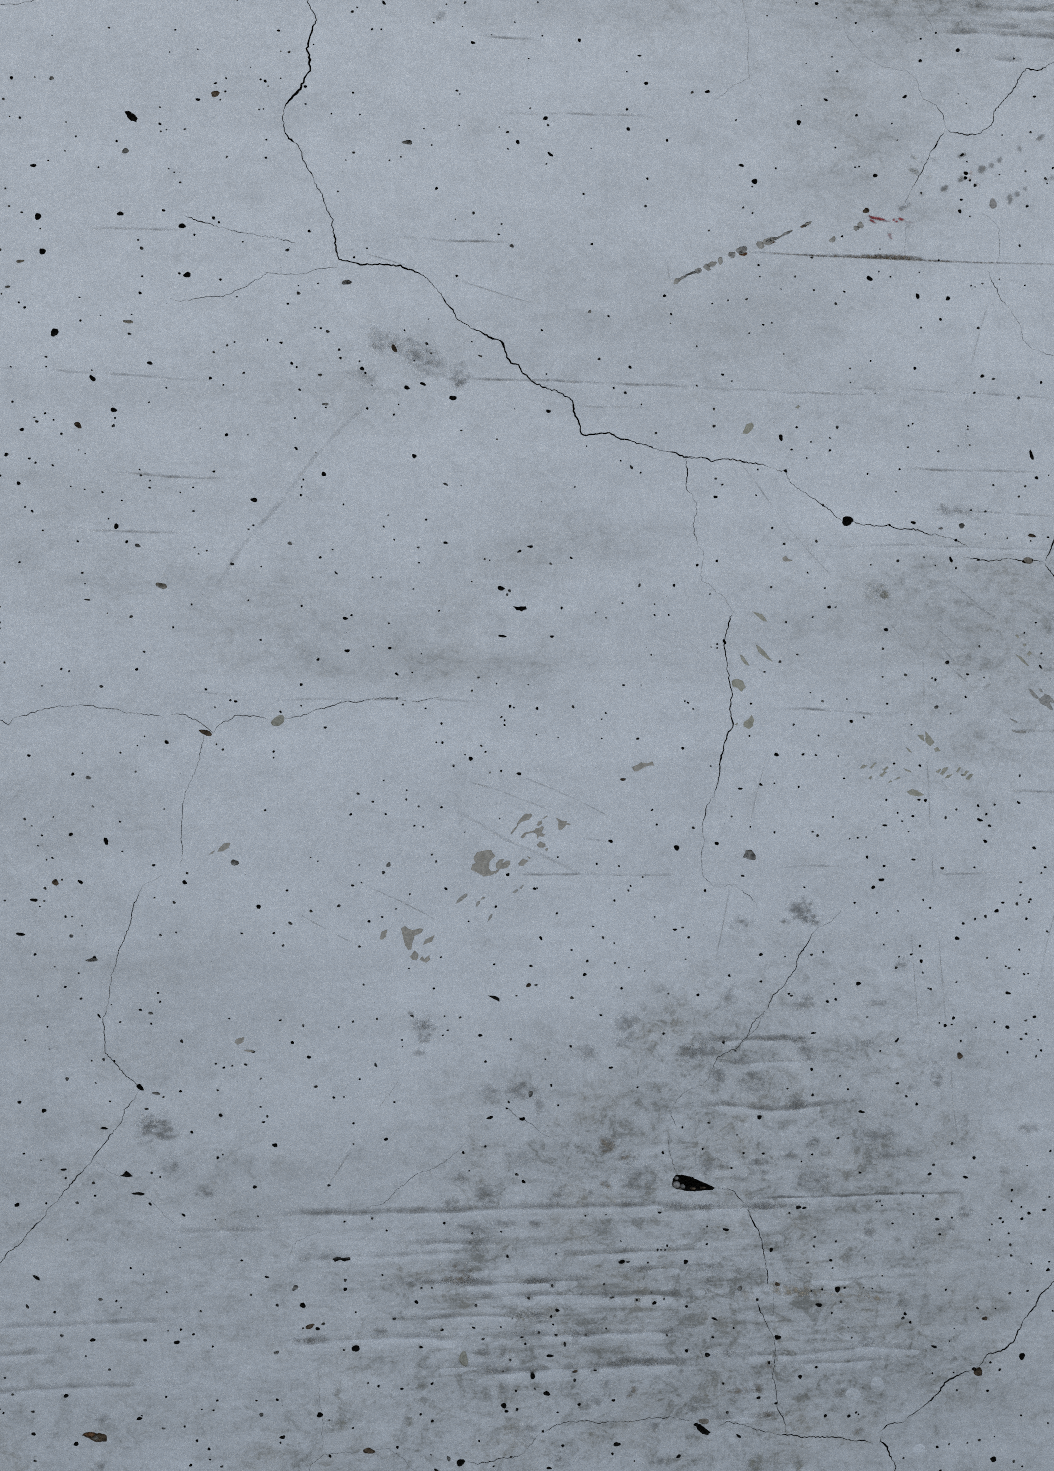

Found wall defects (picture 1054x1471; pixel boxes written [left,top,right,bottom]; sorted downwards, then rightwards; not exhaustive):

crack [173,1,1054,900]
crack [0,697,438,1263]
crack [309,1372,415,1471]
crack [463,1188,1054,1471]